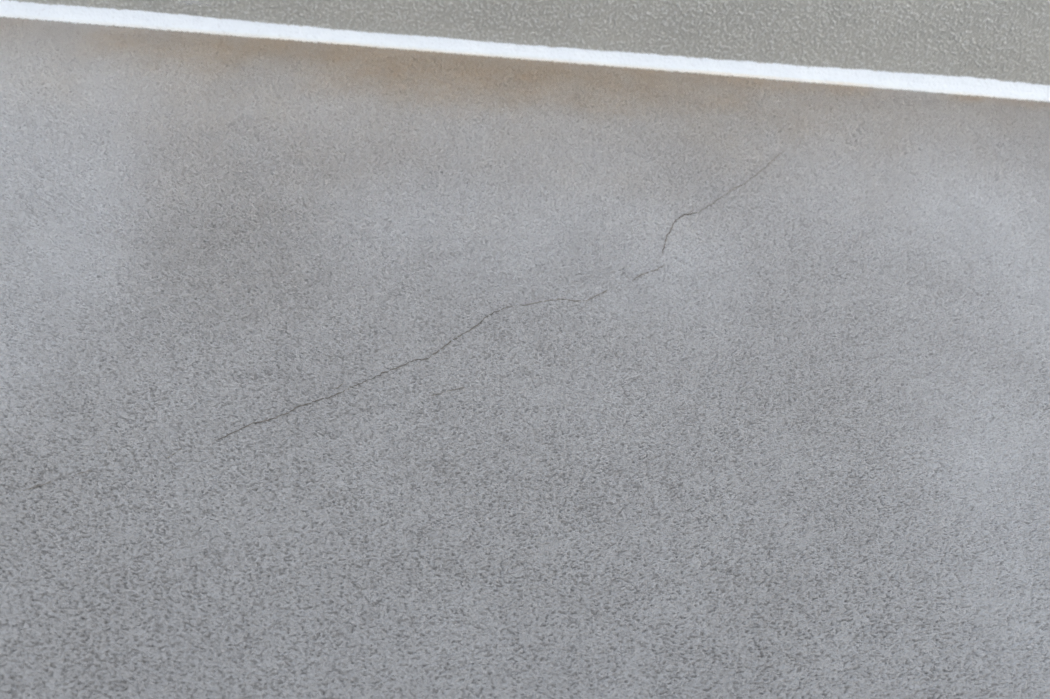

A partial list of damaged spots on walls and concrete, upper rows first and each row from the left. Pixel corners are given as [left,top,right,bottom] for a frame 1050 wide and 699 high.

crack [632,150,785,281]
crack [216,290,607,441]